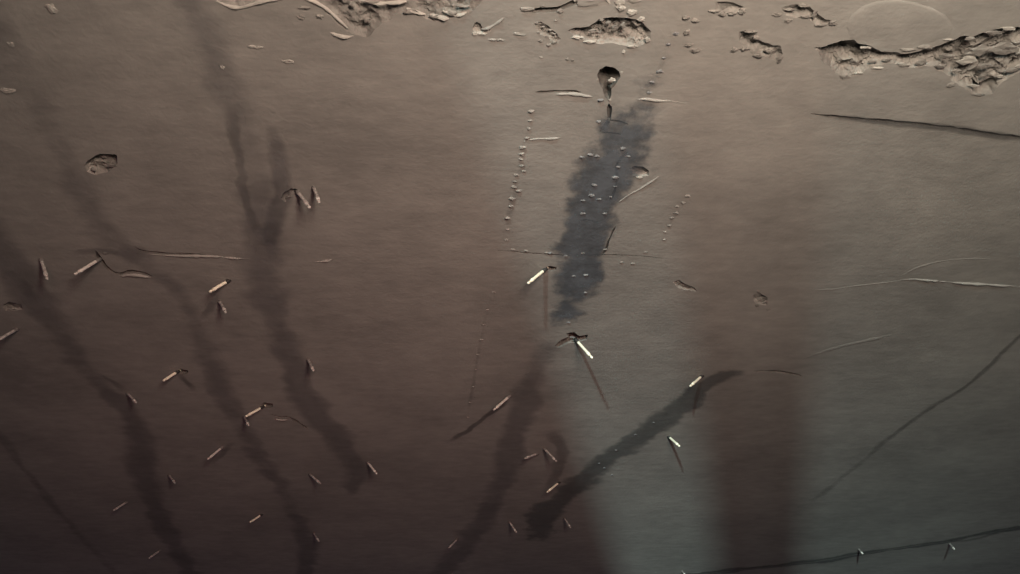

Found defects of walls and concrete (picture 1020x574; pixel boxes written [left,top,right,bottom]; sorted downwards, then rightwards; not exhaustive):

spalling [215,0,277,9]
spalling [297,0,651,58]
spalling [772,4,837,27]
spalling [814,27,1020,97]
crack [811,113,1020,139]
crack [698,527,1020,574]